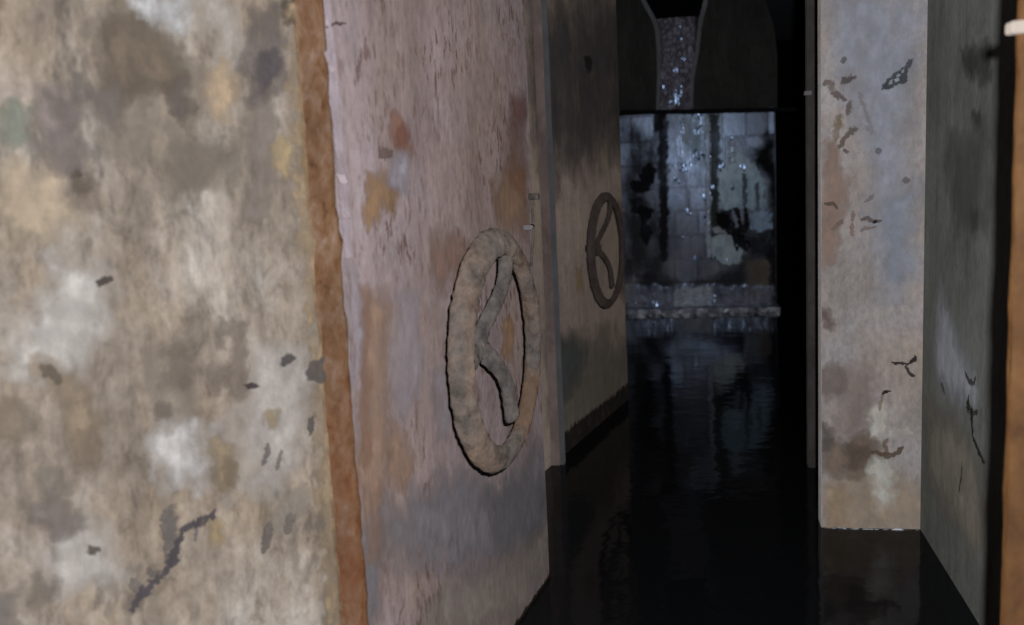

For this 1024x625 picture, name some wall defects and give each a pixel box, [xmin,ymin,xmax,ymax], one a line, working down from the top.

peeling [882,59,912,90]
leakage [625,0,776,307]
crack [879,356,917,411]
crack [941,371,985,493]
crack [126,504,216,613]